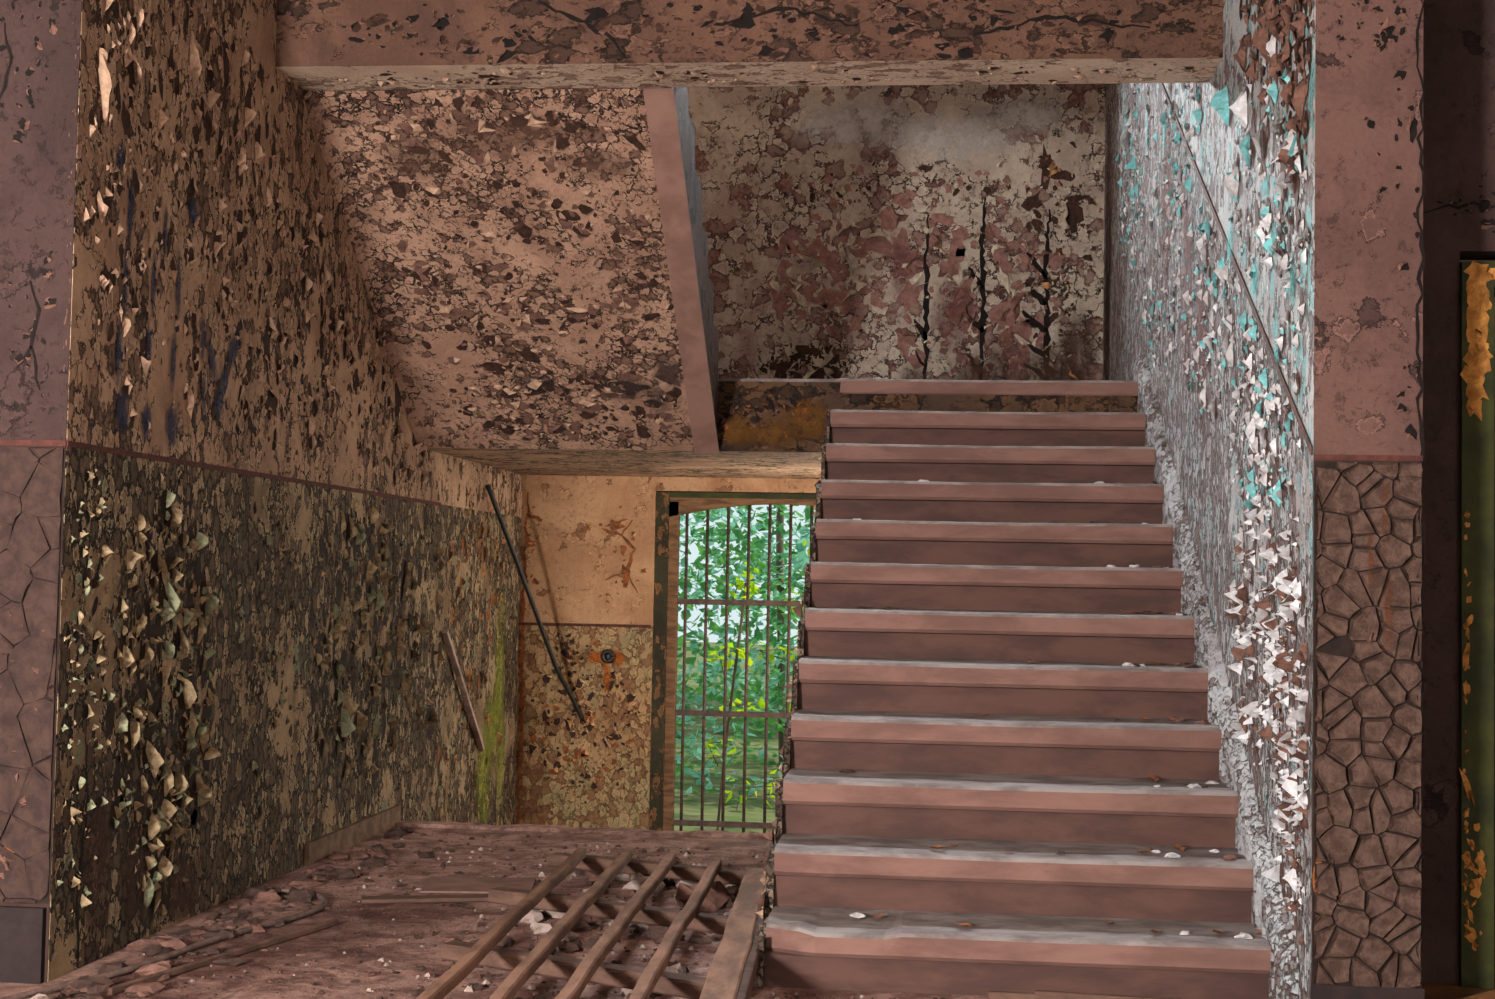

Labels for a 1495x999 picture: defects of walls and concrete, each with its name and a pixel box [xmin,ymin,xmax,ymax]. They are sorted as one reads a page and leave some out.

crack [0,22,13,98]
peeling [1336,0,1408,58]
peeling [336,3,683,445]
crack [16,281,41,390]
peeling [57,0,508,923]
peeling [578,0,1314,946]
crack [1312,0,1495,988]
crack [0,446,89,962]
peeling [527,631,640,804]
water stain [84,805,146,945]
water stain [163,859,198,916]
peeling [1459,730,1487,951]